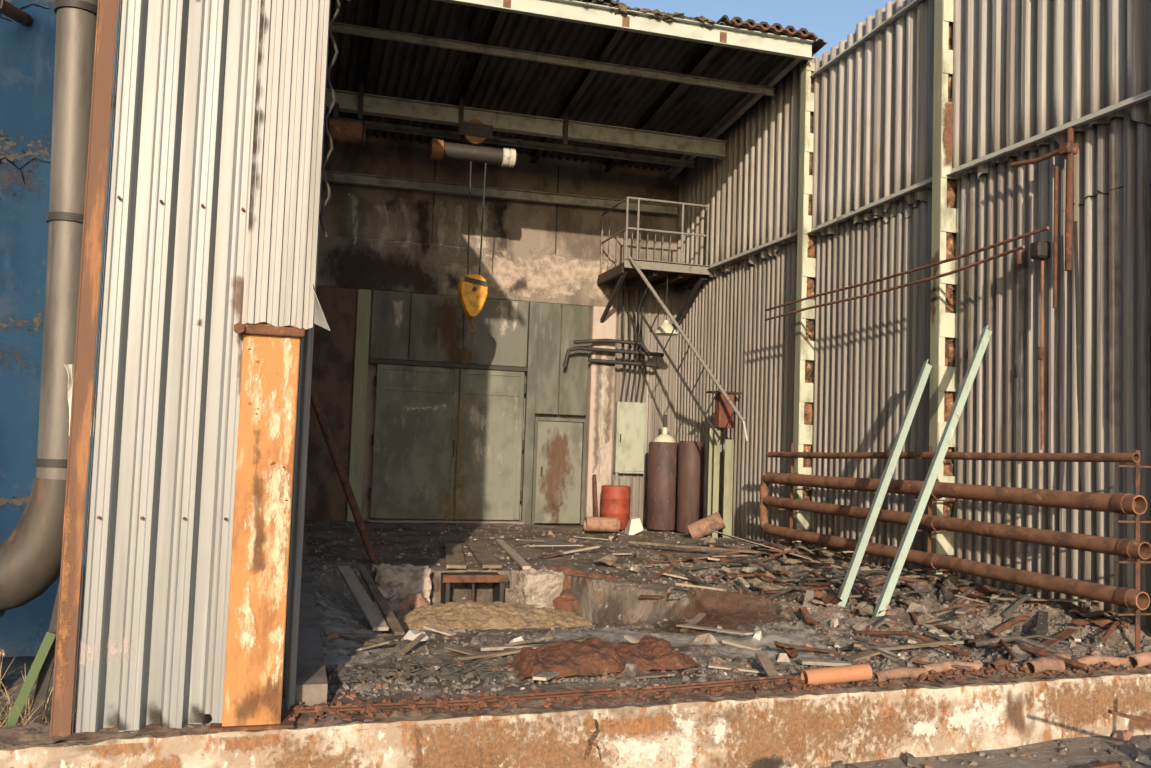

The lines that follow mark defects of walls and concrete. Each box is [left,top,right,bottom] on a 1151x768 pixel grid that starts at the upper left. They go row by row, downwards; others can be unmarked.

peeling [0,130,50,196]
crack [0,157,50,185]
damp [322,195,509,325]
damp [499,301,518,335]
peeling [245,338,293,440]
corrosion [540,436,569,523]
peeling [245,461,291,609]
corrosion [55,495,72,687]
peeling [236,587,284,683]
corrosion [403,713,676,768]
corrosion [706,694,949,768]
corrosion [1008,677,1151,737]